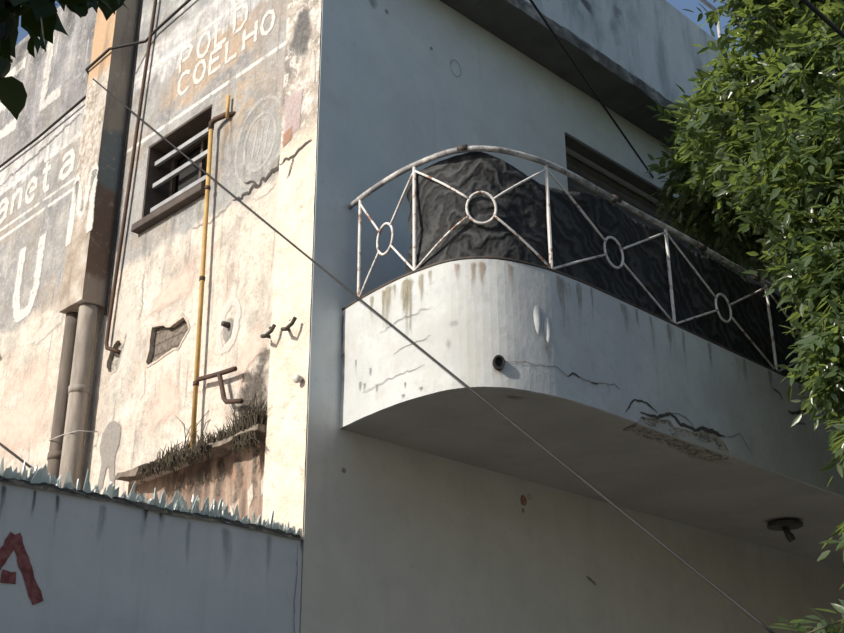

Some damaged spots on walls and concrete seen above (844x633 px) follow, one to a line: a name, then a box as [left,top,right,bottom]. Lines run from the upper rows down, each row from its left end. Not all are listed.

damp [291,12,315,81]
crack [192,139,311,229]
peeling [105,286,140,377]
flaking render [145,315,190,367]
damp [236,349,270,421]
crack [506,361,753,455]
spalling [623,417,735,462]